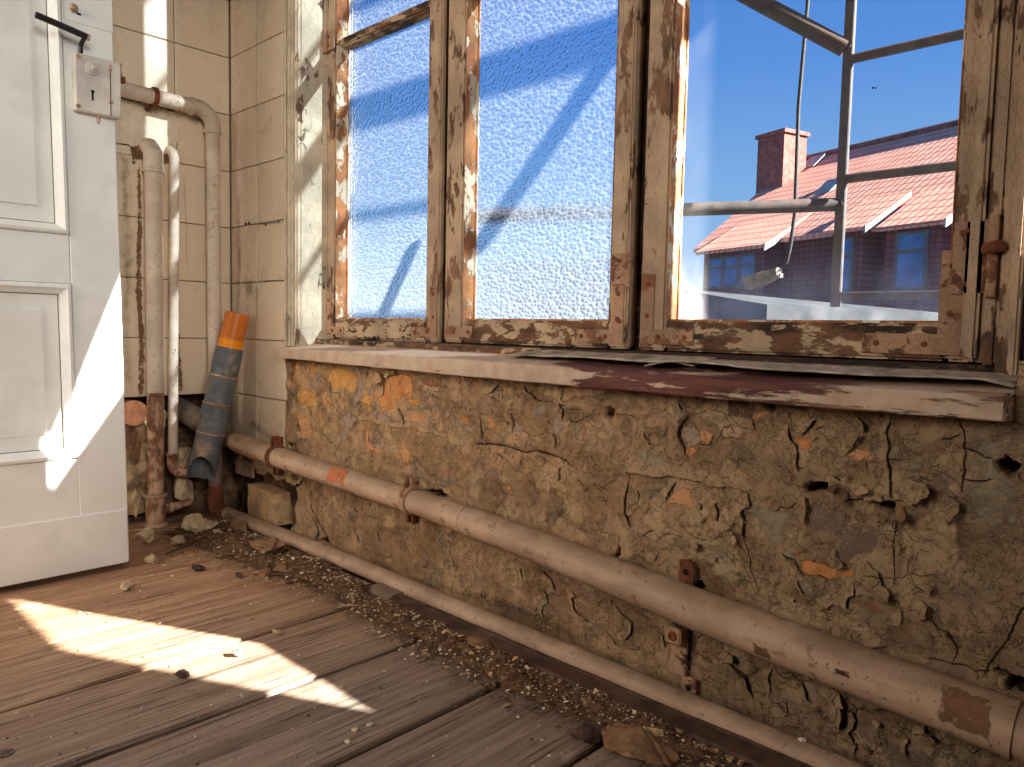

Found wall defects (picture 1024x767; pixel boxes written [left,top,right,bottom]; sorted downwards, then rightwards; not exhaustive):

peeling [297,367,441,436]
peeling [681,427,712,457]
peeling [728,400,776,433]
peeling [669,487,702,510]
peeling [793,481,829,524]
flaking render [839,418,1022,528]
crack [618,396,1024,674]
peeling [783,548,854,602]
crack [715,647,788,718]
peeling [796,680,843,728]
crack [826,706,940,759]
peeling [938,687,991,742]